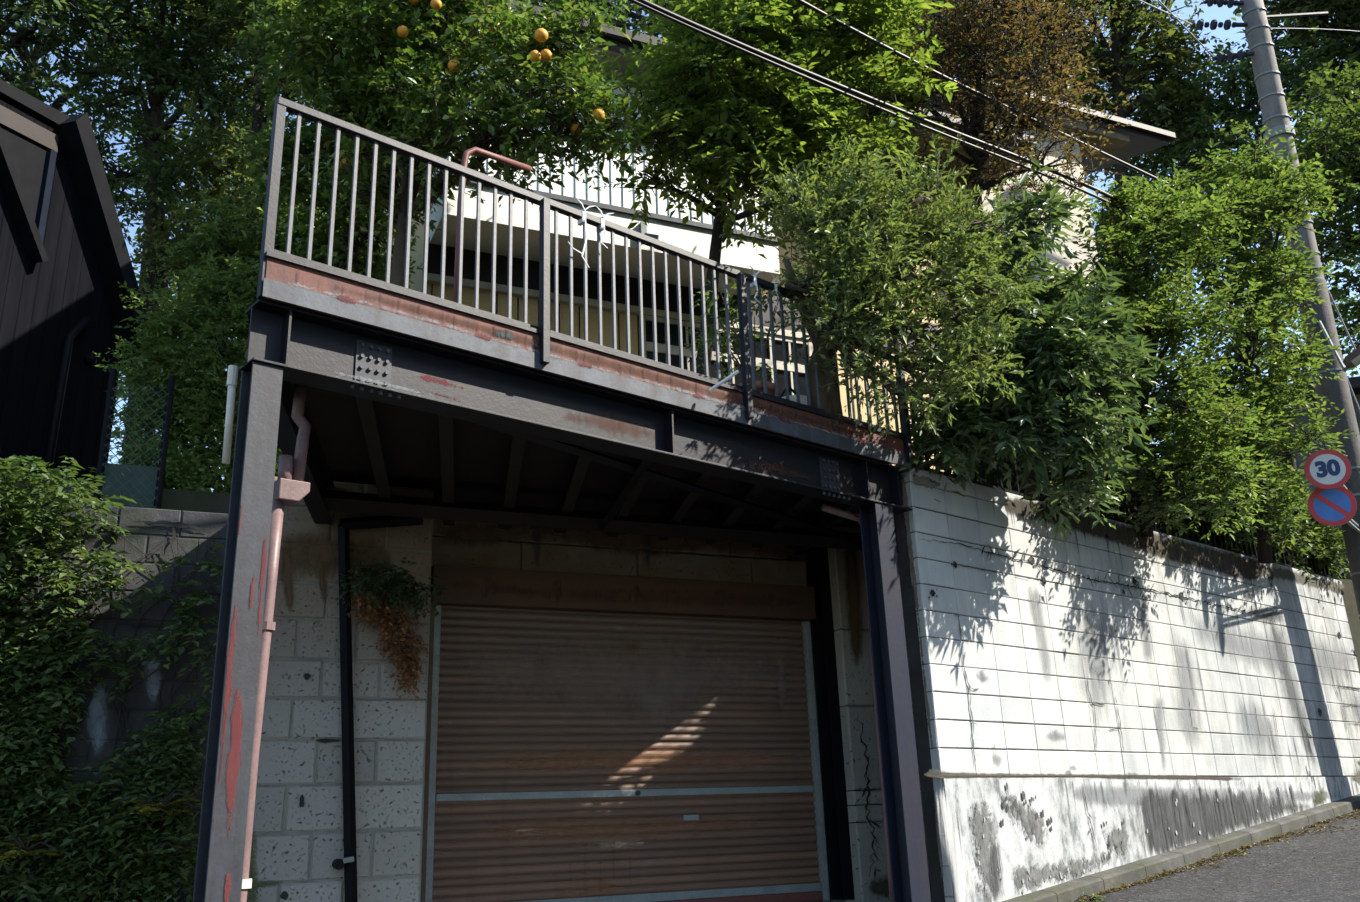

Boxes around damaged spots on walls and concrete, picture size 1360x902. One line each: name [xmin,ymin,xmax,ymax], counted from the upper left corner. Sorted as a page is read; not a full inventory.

rust [389,301,849,434]
water stain [845,549,862,662]
water stain [993,498,1344,759]
water stain [1312,644,1350,679]
crack [857,713,881,877]
water stain [870,878,889,898]
water stain [925,745,1360,902]